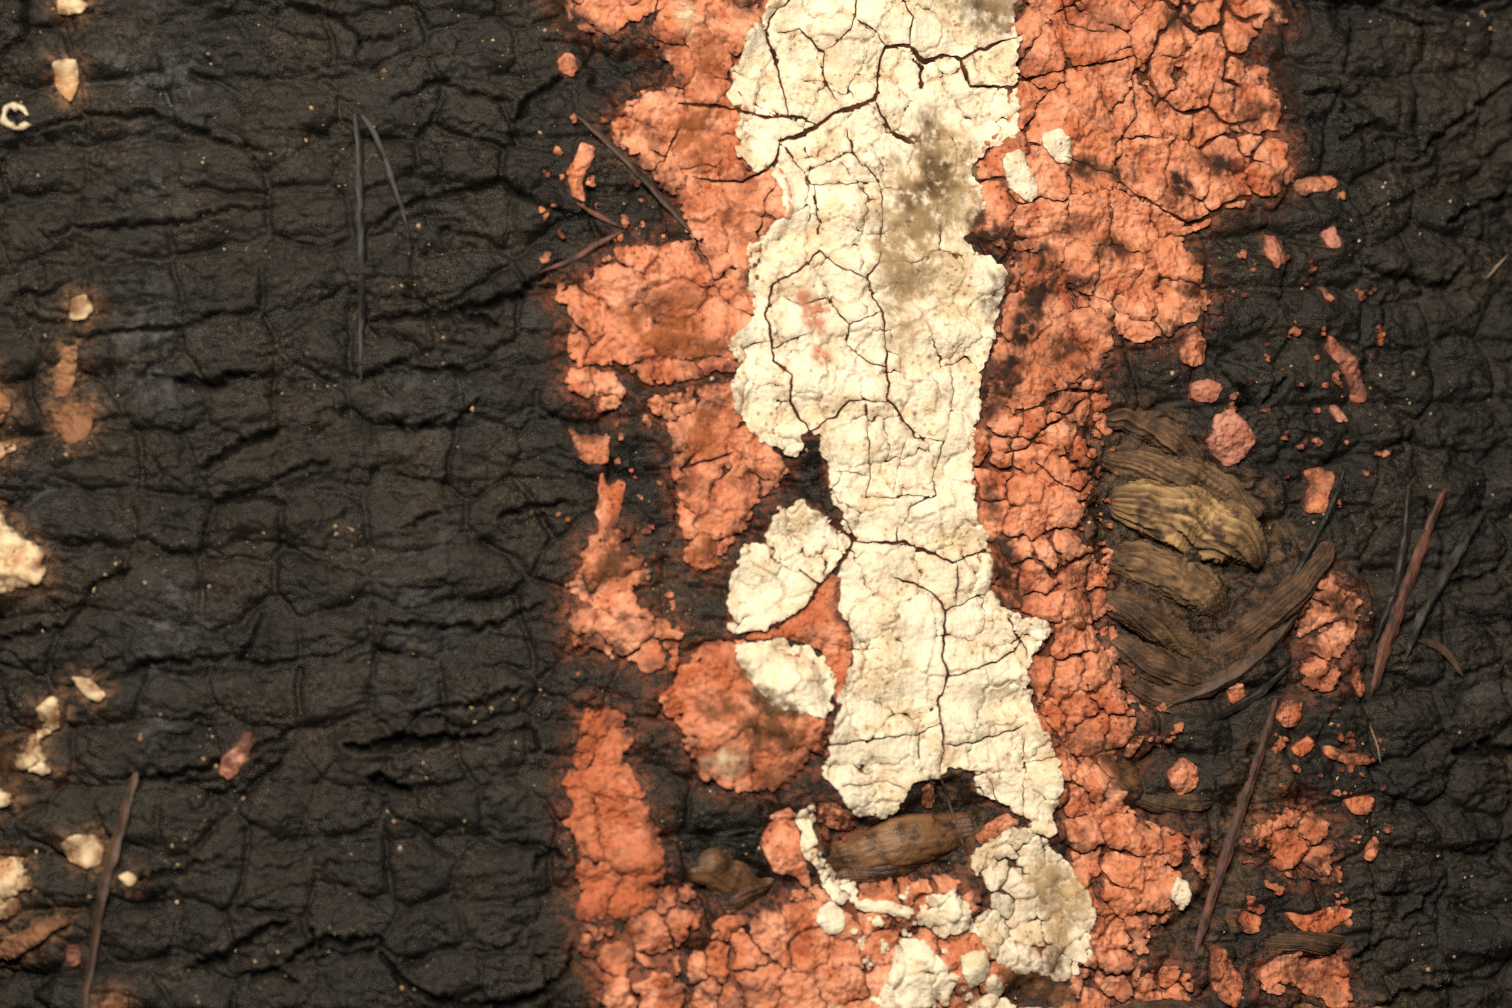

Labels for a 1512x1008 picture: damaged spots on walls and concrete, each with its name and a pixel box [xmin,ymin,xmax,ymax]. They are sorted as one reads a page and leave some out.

peeling [57,0,88,15]
peeling [52,59,80,102]
peeling [543,142,597,209]
peeling [50,346,96,443]
crack [611,361,731,395]
crack [653,0,1262,808]
crack [1217,365,1287,409]
peeling [555,0,1394,1008]
peeling [0,511,49,594]
peeling [15,697,63,776]
peeling [61,834,105,869]
peeling [0,856,71,960]